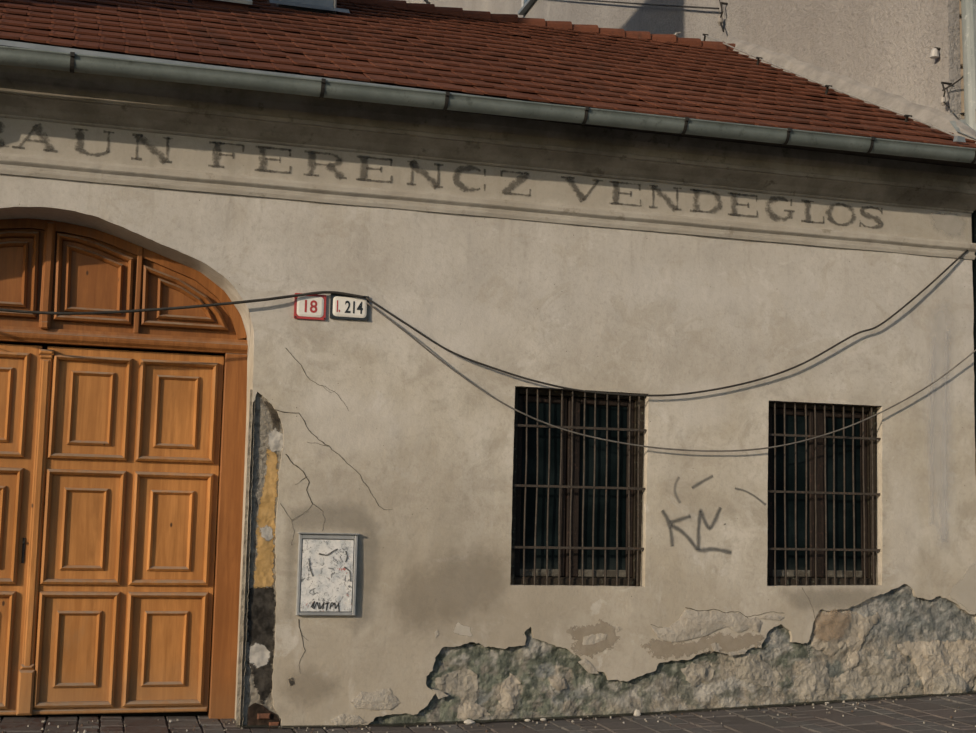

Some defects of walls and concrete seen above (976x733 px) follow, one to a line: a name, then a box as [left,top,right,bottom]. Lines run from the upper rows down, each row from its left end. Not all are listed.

spalling [236,389,284,728]
crack [280,454,325,541]
crack [277,410,391,510]
spalling [369,584,976,724]